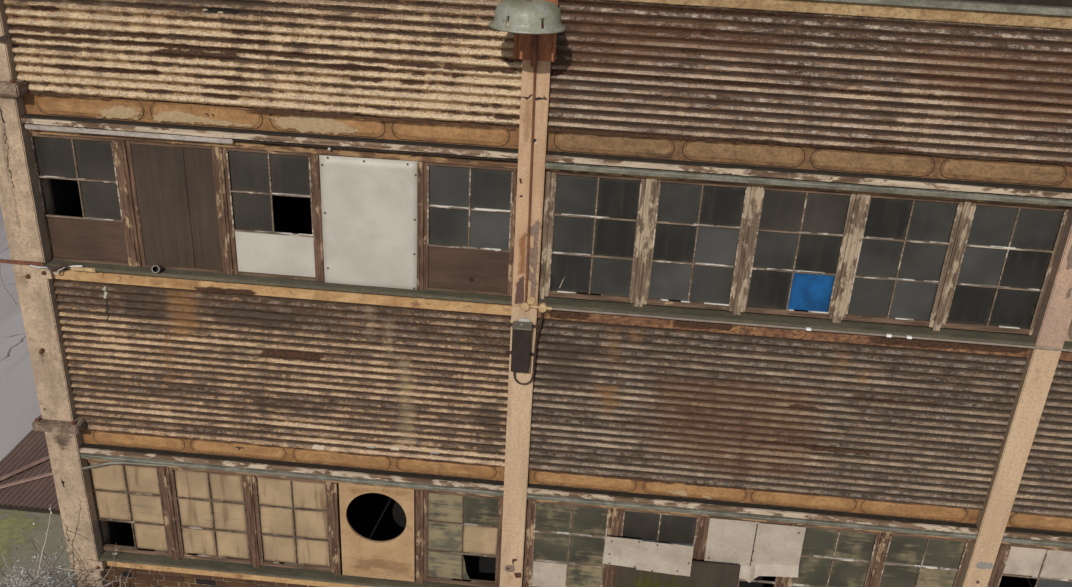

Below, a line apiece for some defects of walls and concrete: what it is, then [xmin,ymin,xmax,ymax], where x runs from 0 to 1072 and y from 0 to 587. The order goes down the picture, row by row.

corrosion [563,0,789,16]
corrosion [627,25,712,35]
corrosion [8,24,518,85]
corrosion [29,90,107,99]
corrosion [195,75,519,129]
corrosion [551,69,1072,107]
corrosion [548,125,1072,166]
peeling [515,219,541,305]
corrosion [673,320,733,331]
corrosion [870,336,1029,354]
corrosion [762,441,875,455]
spalling [505,559,521,578]